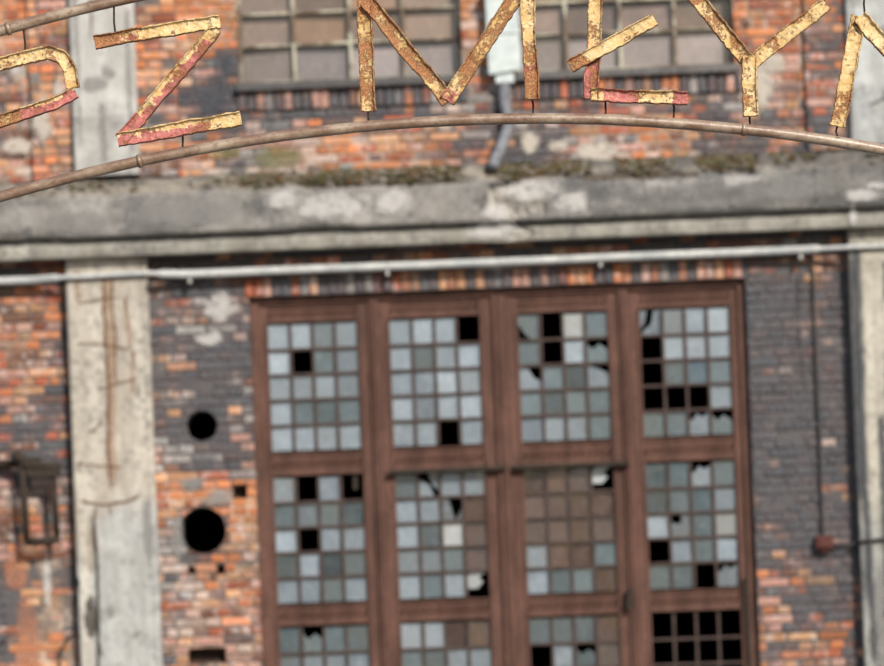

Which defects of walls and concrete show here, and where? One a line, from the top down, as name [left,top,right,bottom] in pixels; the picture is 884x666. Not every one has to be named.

water stain [267,190,412,220]
water stain [471,204,513,239]
water stain [507,180,585,211]
water stain [635,175,837,209]
water stain [847,182,884,225]
water stain [851,249,884,666]